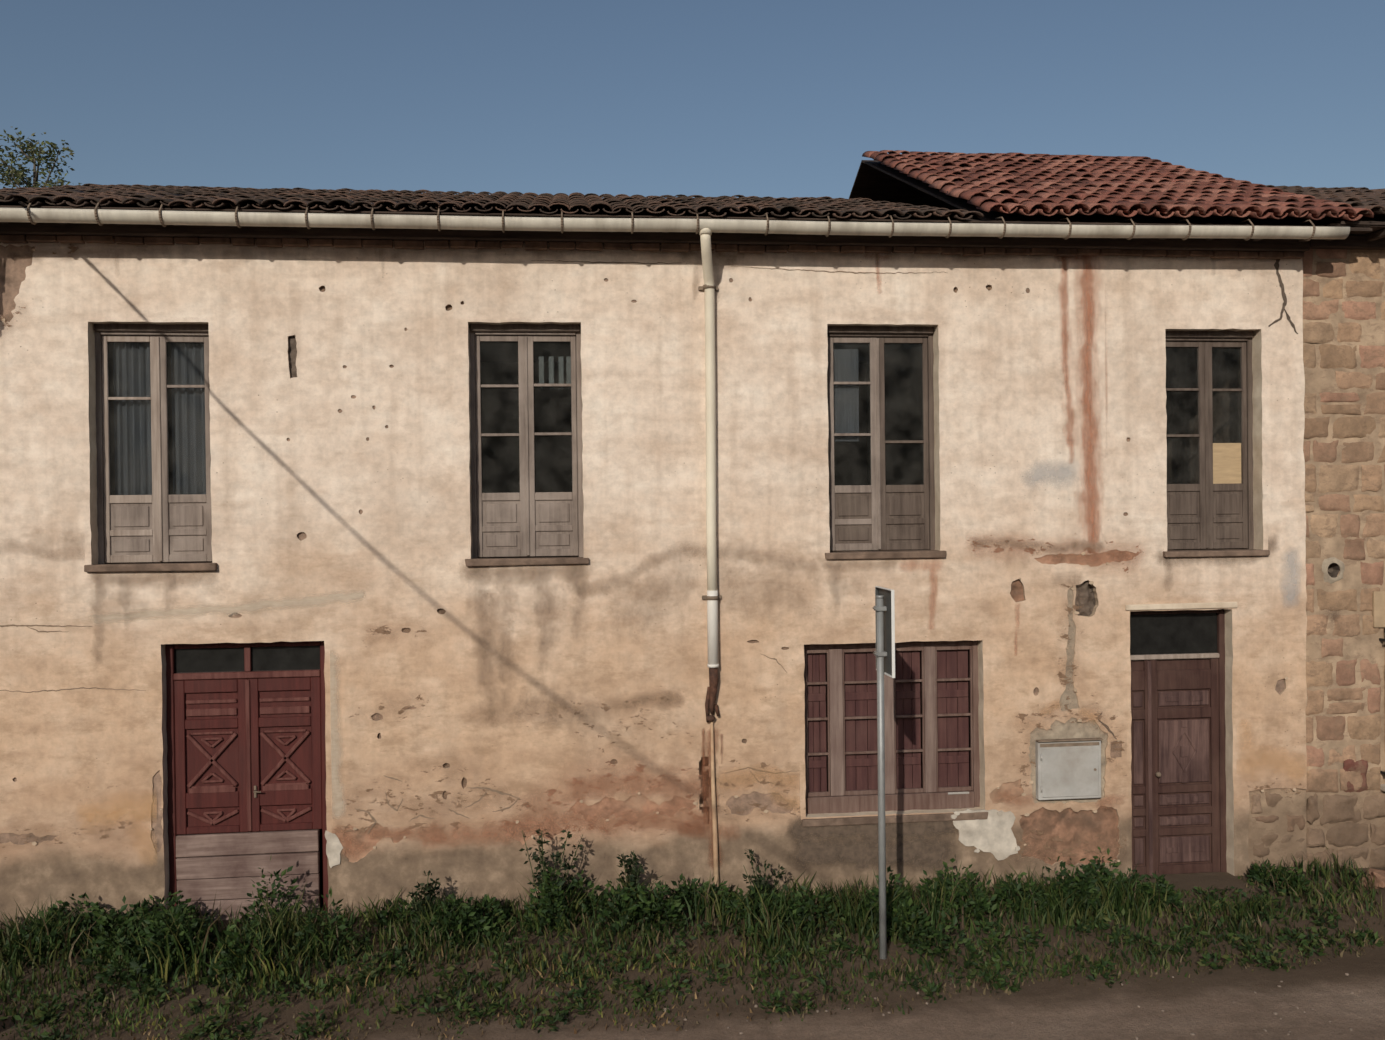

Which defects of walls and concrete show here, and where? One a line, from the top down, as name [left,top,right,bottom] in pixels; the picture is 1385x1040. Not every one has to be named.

flaking render [0,243,79,327]
crack [1269,259,1298,334]
rust [1062,256,1095,539]
peeling [370,625,427,636]
flaking render [336,686,800,863]
flaking render [951,535,1144,872]